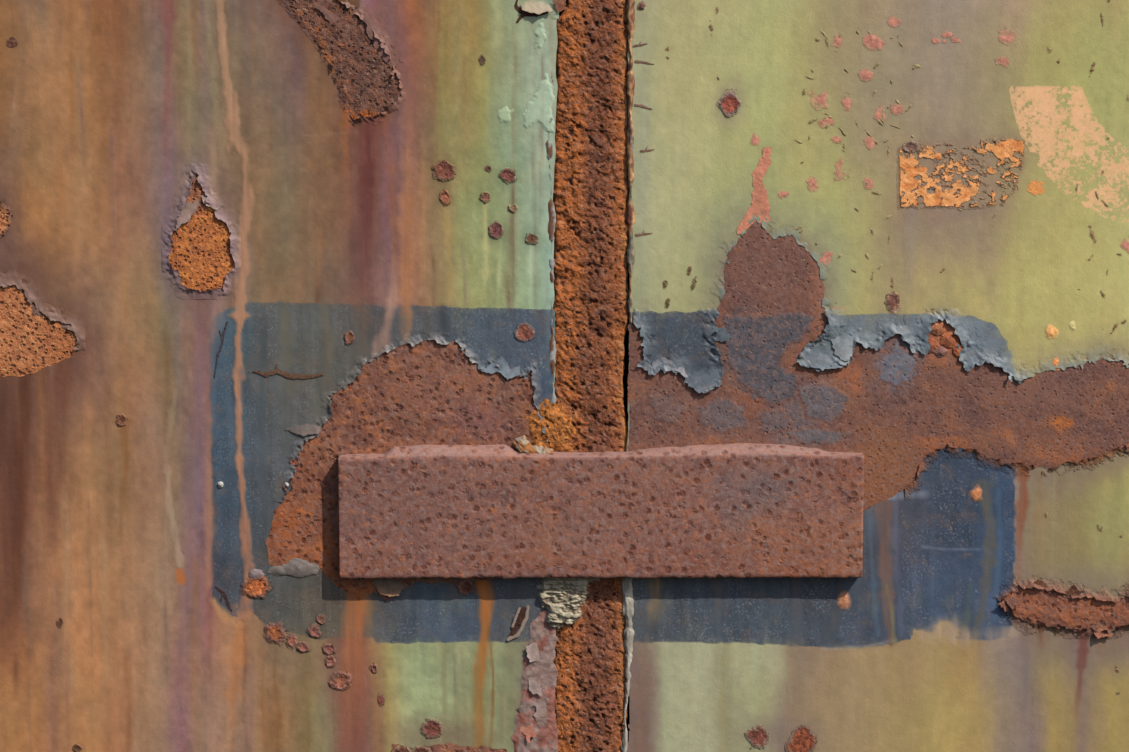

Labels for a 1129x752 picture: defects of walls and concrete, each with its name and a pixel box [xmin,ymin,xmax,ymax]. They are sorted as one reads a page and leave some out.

peeling [897,137,1045,210]
spalling [0,199,13,238]
spalling [885,291,902,315]
peeling [1045,320,1076,339]
corrosion [266,0,577,752]
corrosion [627,212,1129,727]
peeling [968,484,983,502]
corrosion [201,462,248,630]
peeling [511,610,559,752]